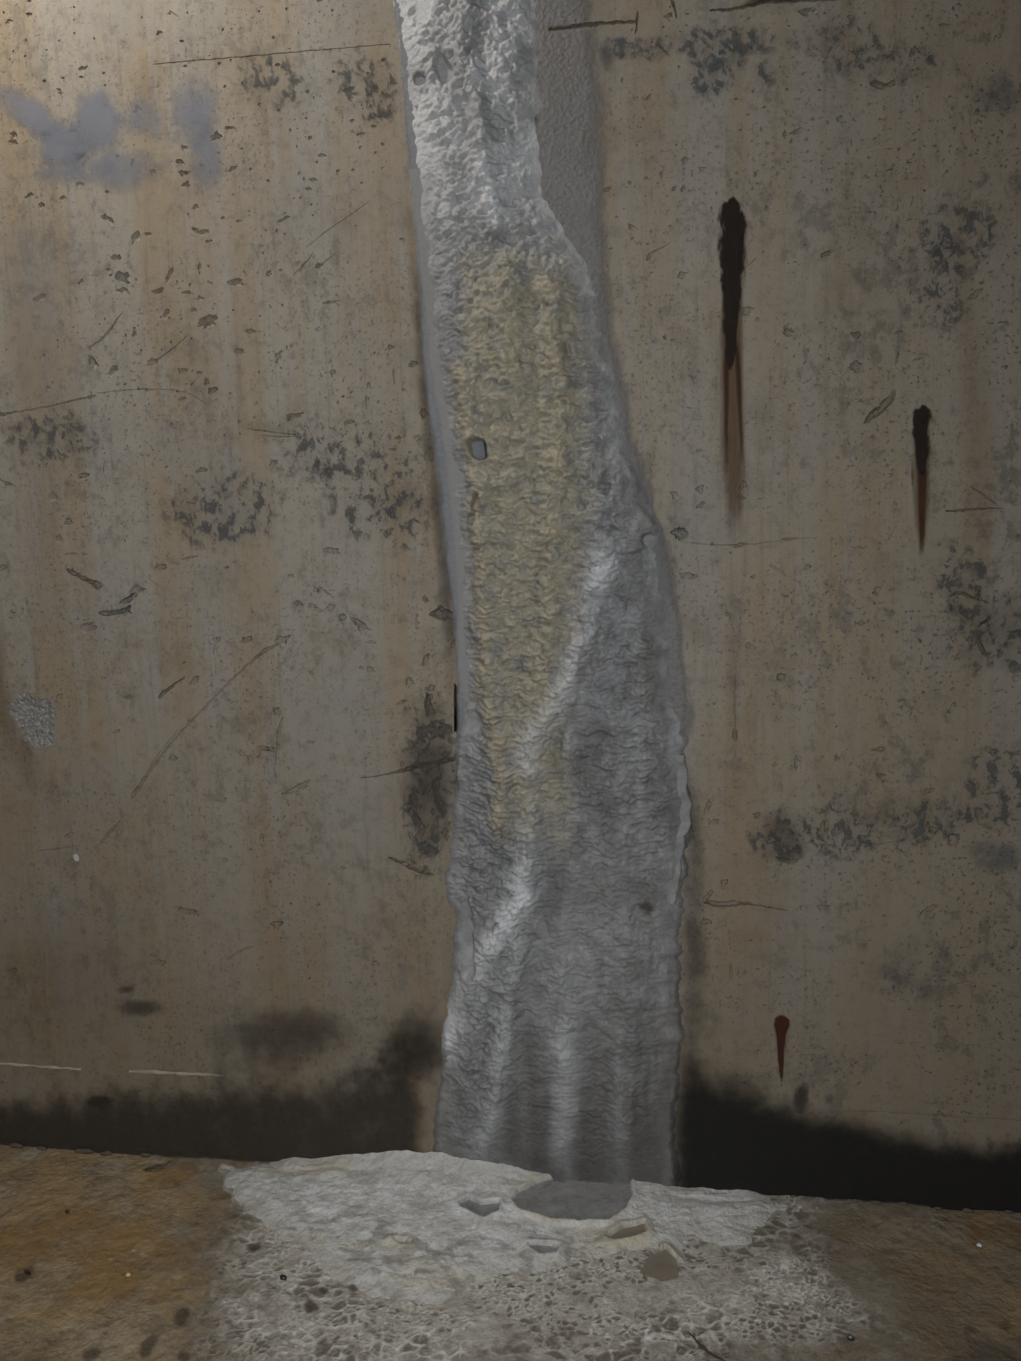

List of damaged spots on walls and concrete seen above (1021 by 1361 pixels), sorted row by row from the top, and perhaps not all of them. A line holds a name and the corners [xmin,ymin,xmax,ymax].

crack [549,11,639,34]
crack [669,0,677,19]
corrosion [718,197,746,508]
corrosion [911,405,932,543]
crack [158,678,184,699]
spalling [397,574,456,752]
corrosion [774,1016,789,1078]
leakage [0,1068,1021,1361]